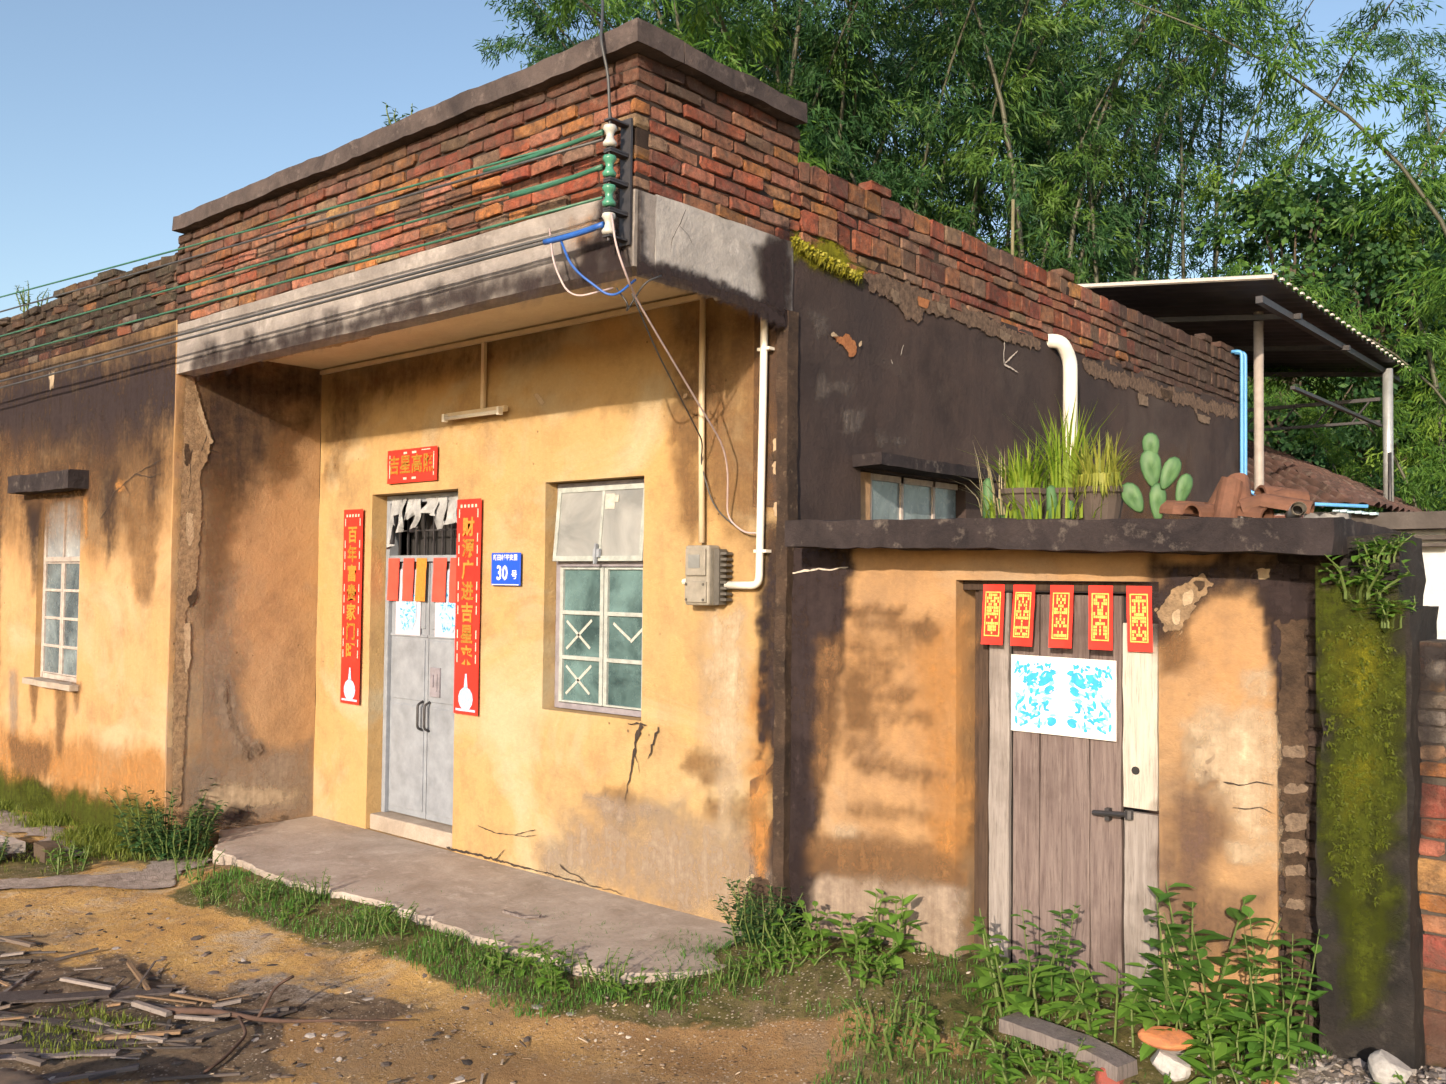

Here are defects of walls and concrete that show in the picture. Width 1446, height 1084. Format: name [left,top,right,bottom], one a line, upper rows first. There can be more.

spalling [831,332,862,357]
spalling [863,272,1041,351]
leakage [0,320,176,597]
leakage [186,188,963,959]
spalling [1154,573,1213,636]
spalling [1257,568,1270,579]
leakage [0,675,165,807]
crack [625,722,659,798]